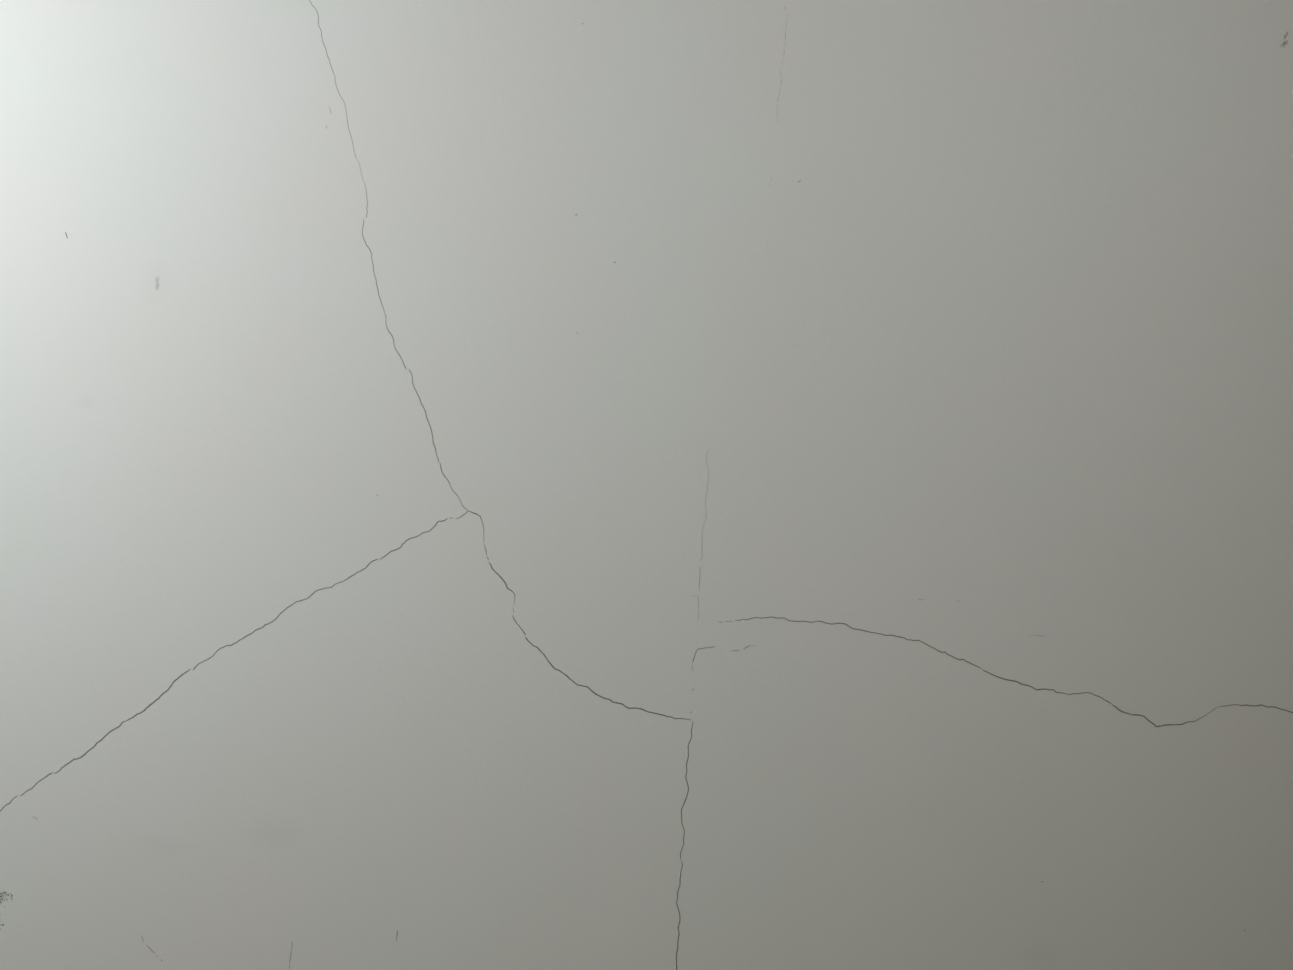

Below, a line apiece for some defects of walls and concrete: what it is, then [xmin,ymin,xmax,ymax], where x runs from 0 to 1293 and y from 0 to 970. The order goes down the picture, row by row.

crack [0,1,693,970]
crack [692,450,1293,728]